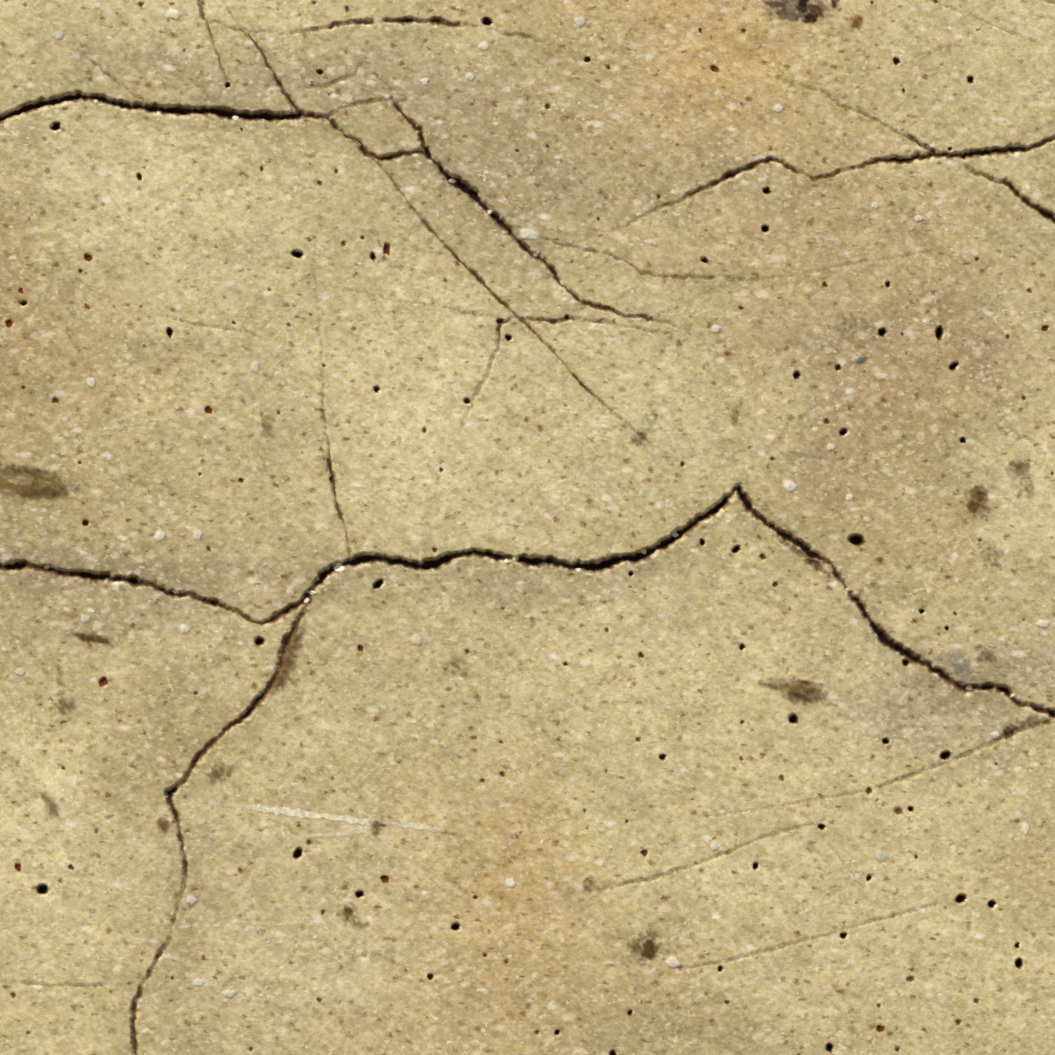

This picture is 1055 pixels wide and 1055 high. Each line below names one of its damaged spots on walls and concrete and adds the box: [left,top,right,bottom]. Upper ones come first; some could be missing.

crack [0,7,709,355]
crack [654,107,1055,224]
crack [572,374,604,404]
crack [0,400,1055,893]
crack [132,946,166,1055]